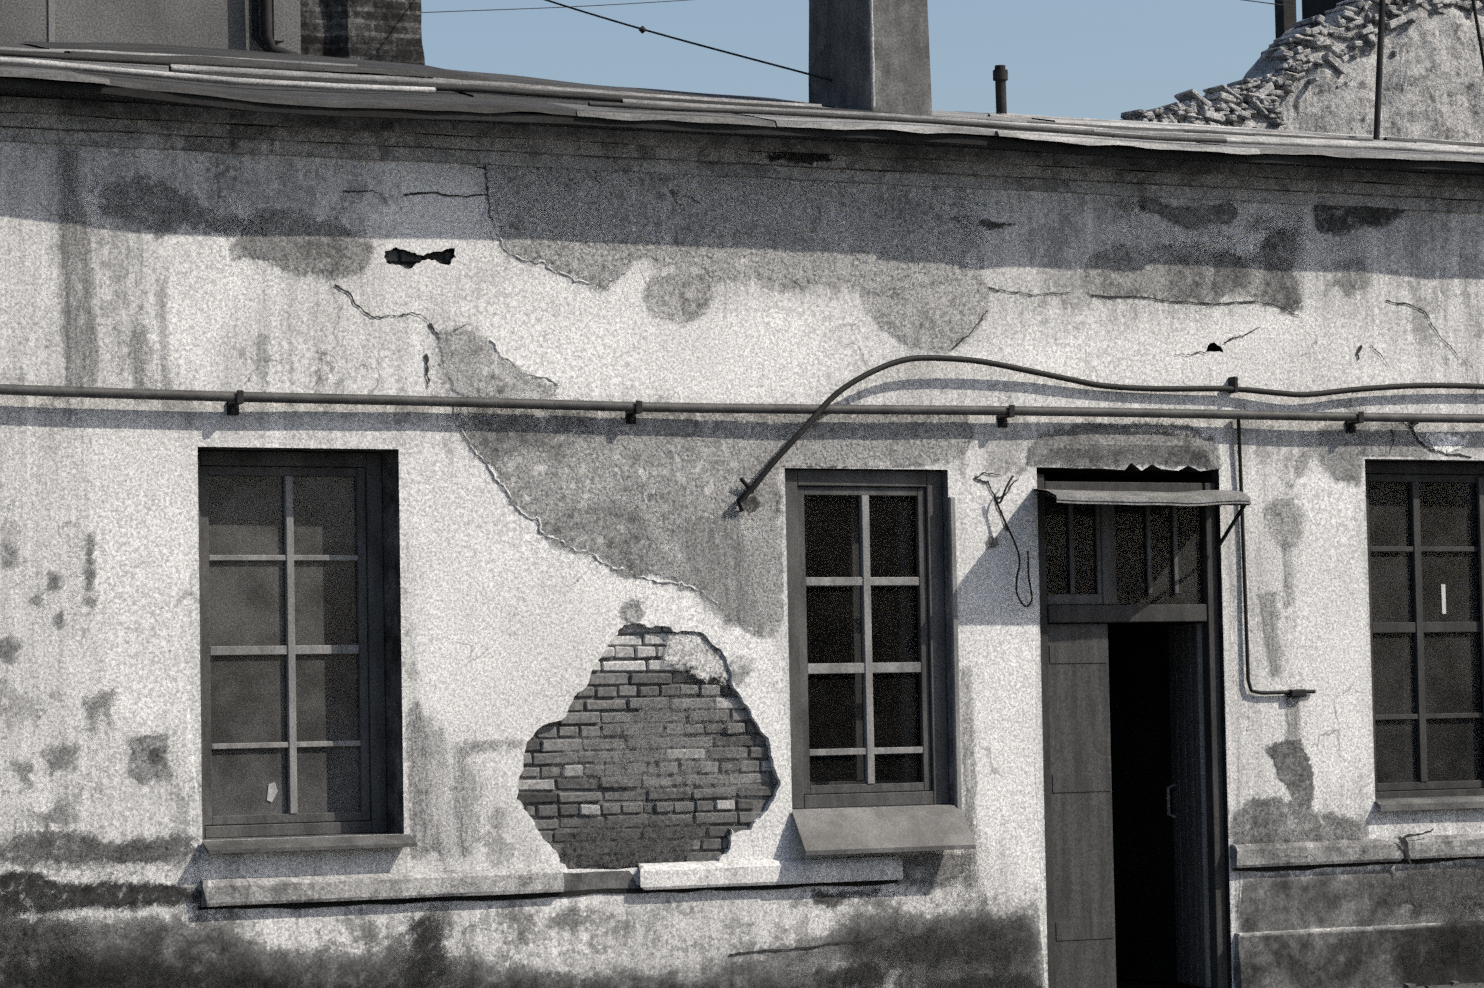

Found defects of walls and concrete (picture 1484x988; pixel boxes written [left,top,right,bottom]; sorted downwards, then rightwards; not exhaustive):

peeling [99,174,453,281]
crack [343,165,493,221]
peeling [486,152,1016,296]
peeling [1083,196,1304,313]
flaking render [1314,194,1416,236]
crack [334,284,466,386]
peeling [437,328,975,638]
water stain [11,688,116,789]
flaking render [517,596,778,891]
water stain [39,798,80,827]
water stain [0,908,683,988]
water stain [812,911,1046,988]